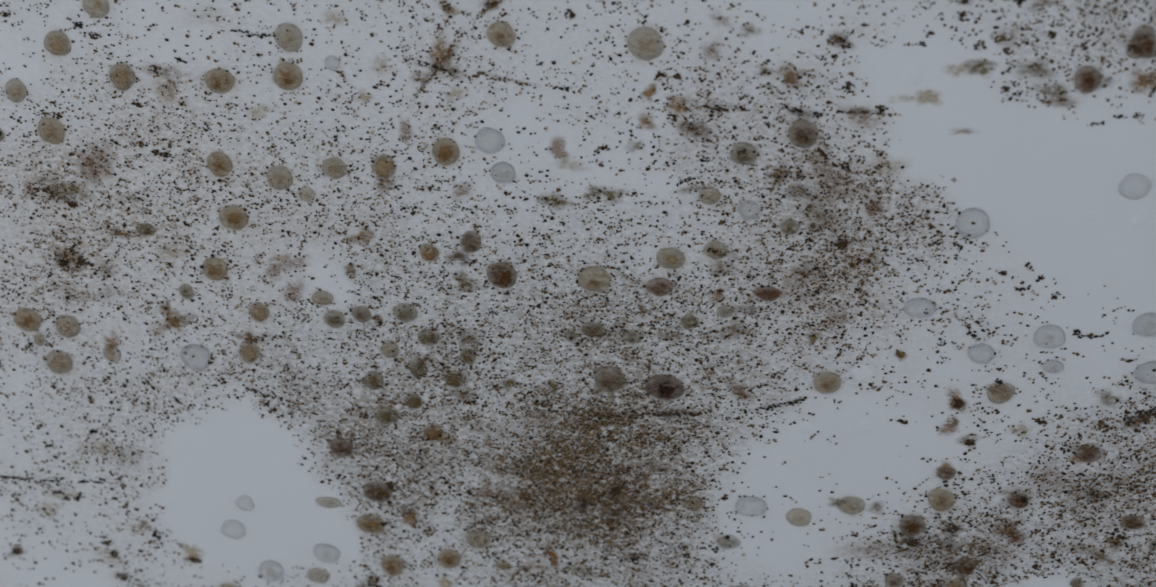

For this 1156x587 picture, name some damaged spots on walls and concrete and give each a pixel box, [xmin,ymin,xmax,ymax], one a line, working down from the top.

mould [155,0,251,25]
damp [287,0,360,46]
mould [545,1,585,38]
mould [903,0,1156,127]
damp [545,140,567,158]
mould [2,403,49,444]
damp [804,345,1156,587]
damp [3,509,34,560]